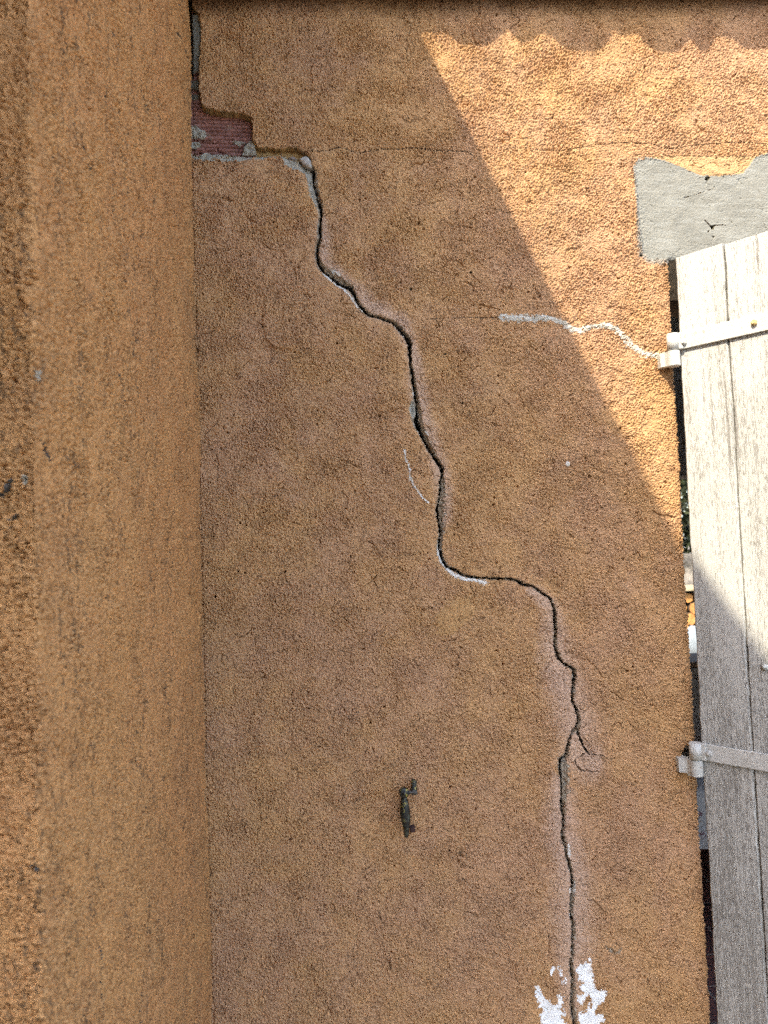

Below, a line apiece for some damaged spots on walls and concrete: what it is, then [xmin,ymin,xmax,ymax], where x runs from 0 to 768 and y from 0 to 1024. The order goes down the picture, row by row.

spalling [188,0,317,207]
crack [304,146,614,1024]